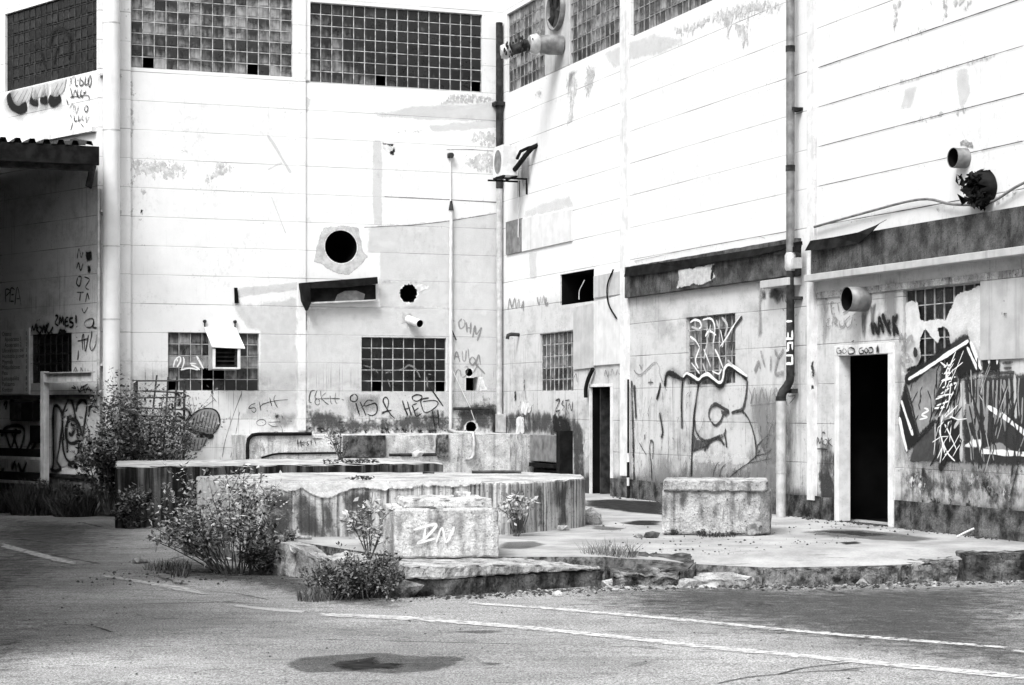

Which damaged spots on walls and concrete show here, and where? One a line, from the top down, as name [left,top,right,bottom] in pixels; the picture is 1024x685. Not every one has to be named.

peeling [674,0,780,48]
peeling [131,150,188,195]
peeling [205,161,232,183]
spalling [677,264,715,288]
peeling [905,286,981,369]
damp [305,380,584,476]
damp [905,446,1022,510]